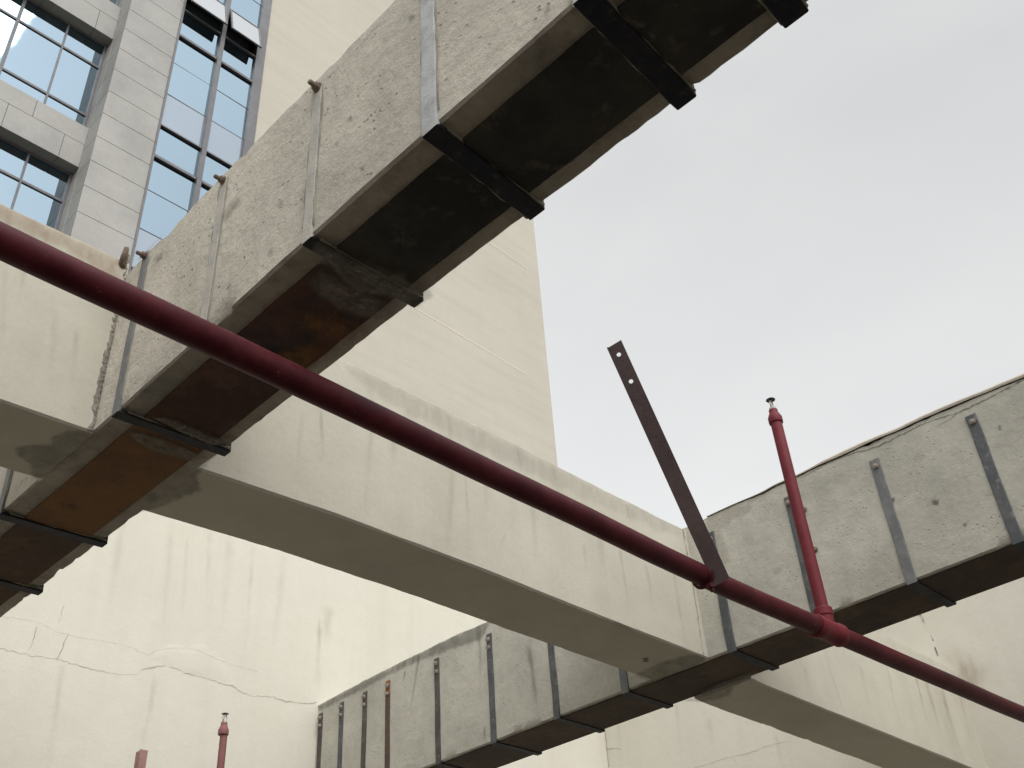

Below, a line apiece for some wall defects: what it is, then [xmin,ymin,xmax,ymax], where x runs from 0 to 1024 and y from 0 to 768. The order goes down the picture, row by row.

spalling [119,247,131,281]
spalling [87,313,118,431]
crack [803,378,1024,477]